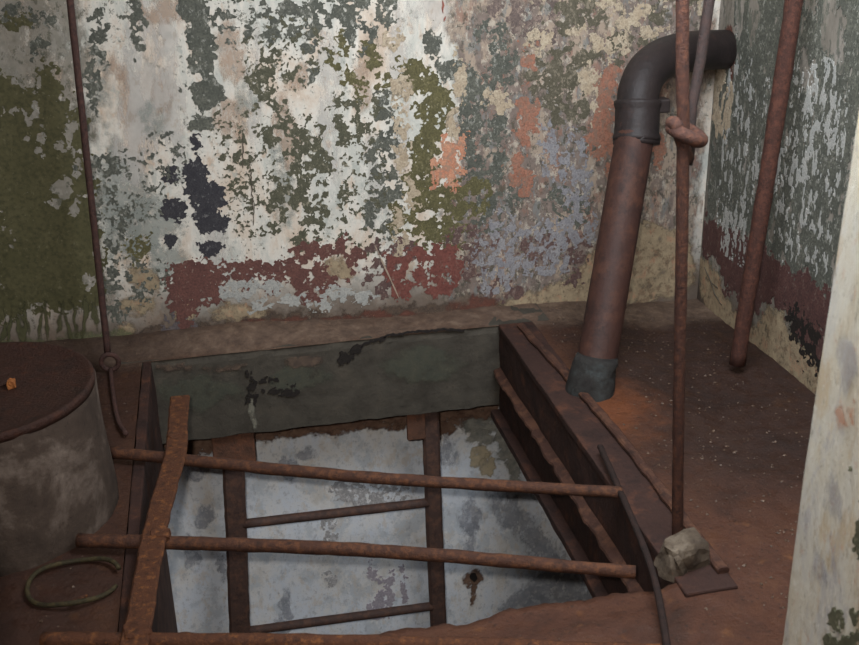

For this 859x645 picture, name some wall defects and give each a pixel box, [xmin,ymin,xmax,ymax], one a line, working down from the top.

water stain [0,0,461,342]
peeling [0,0,676,333]
crack [349,328,465,361]
peeling [687,0,784,329]
peeling [749,0,859,395]
peeling [822,607,859,645]